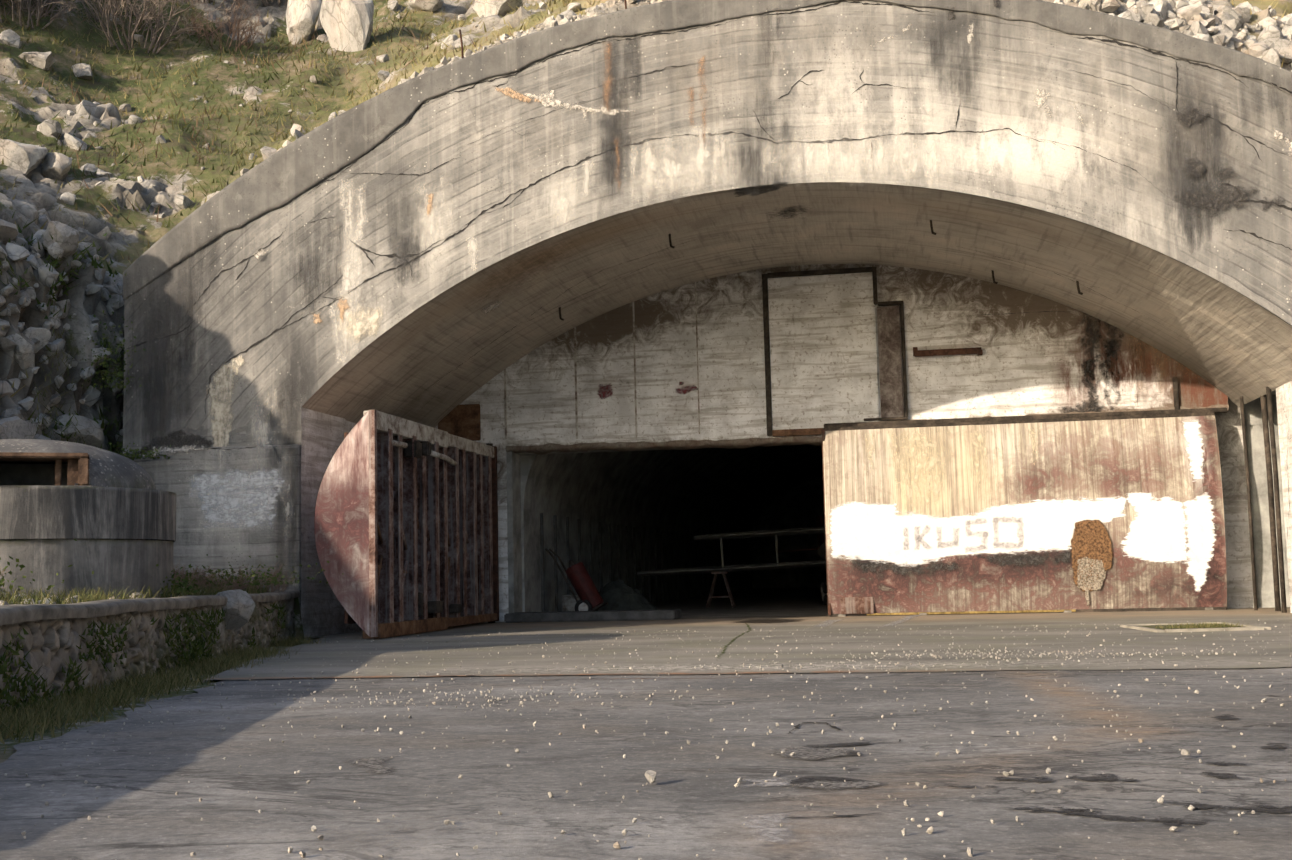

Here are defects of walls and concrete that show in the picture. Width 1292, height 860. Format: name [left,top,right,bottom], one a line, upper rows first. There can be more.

crack [766,1,932,15]
crack [125,20,1292,461]
spalling [130,357,244,459]
rust [1081,313,1121,410]